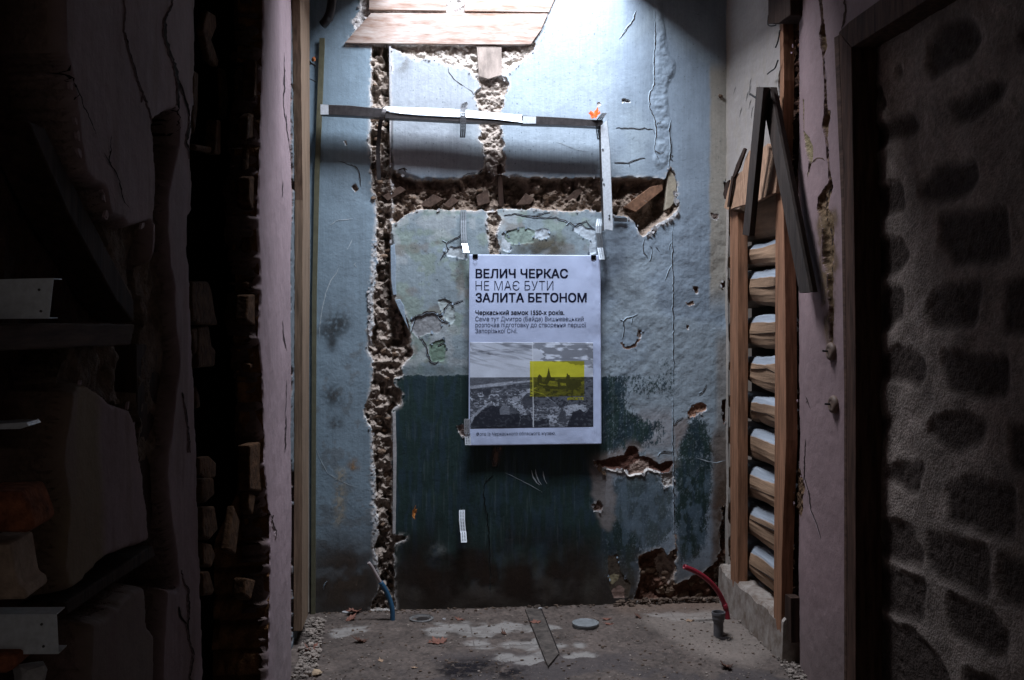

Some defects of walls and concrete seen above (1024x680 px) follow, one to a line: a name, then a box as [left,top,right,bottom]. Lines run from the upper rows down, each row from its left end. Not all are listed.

crack [123,0,191,159]
crack [614,10,673,167]
crack [816,0,847,343]
flaking render [485,209,550,255]
peeling [572,210,597,255]
flaking render [623,191,680,238]
flaking render [687,402,707,418]
flaking render [593,446,675,489]
flaking render [607,506,731,604]